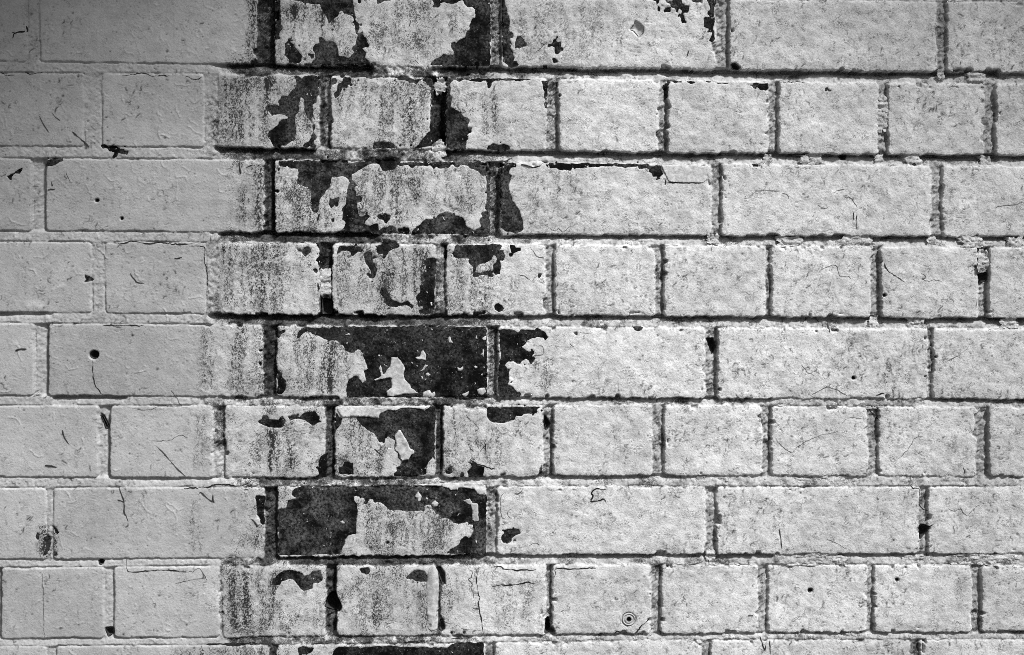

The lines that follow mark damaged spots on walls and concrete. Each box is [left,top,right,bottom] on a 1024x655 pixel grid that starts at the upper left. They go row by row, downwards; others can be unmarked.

peeling [255,0,667,556]
peeling [272,570,325,591]
peeling [406,566,427,584]